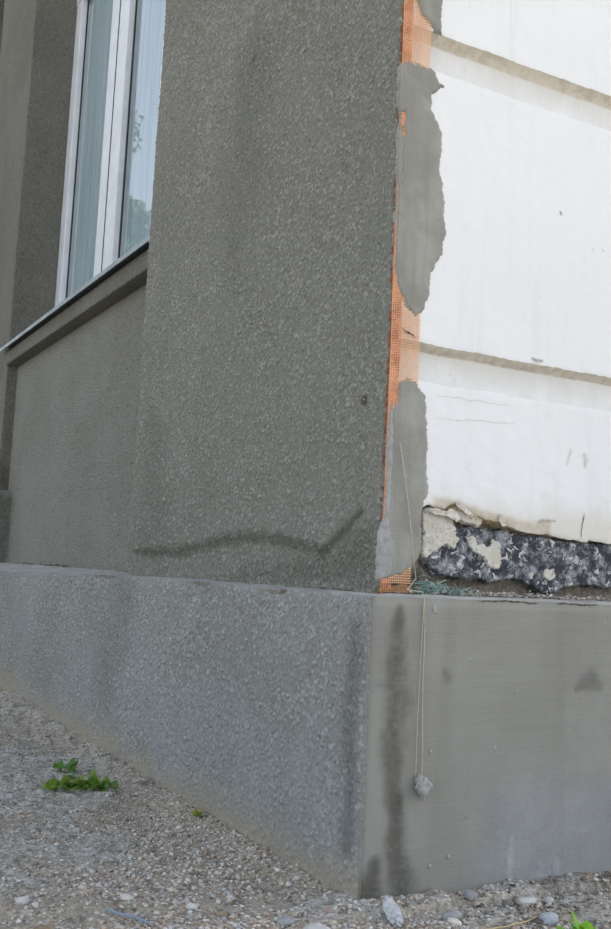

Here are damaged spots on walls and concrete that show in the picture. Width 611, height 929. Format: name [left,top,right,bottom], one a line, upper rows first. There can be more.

peeling [419,502,501,569]
peeling [529,569,555,581]
leakage [360,861,378,899]